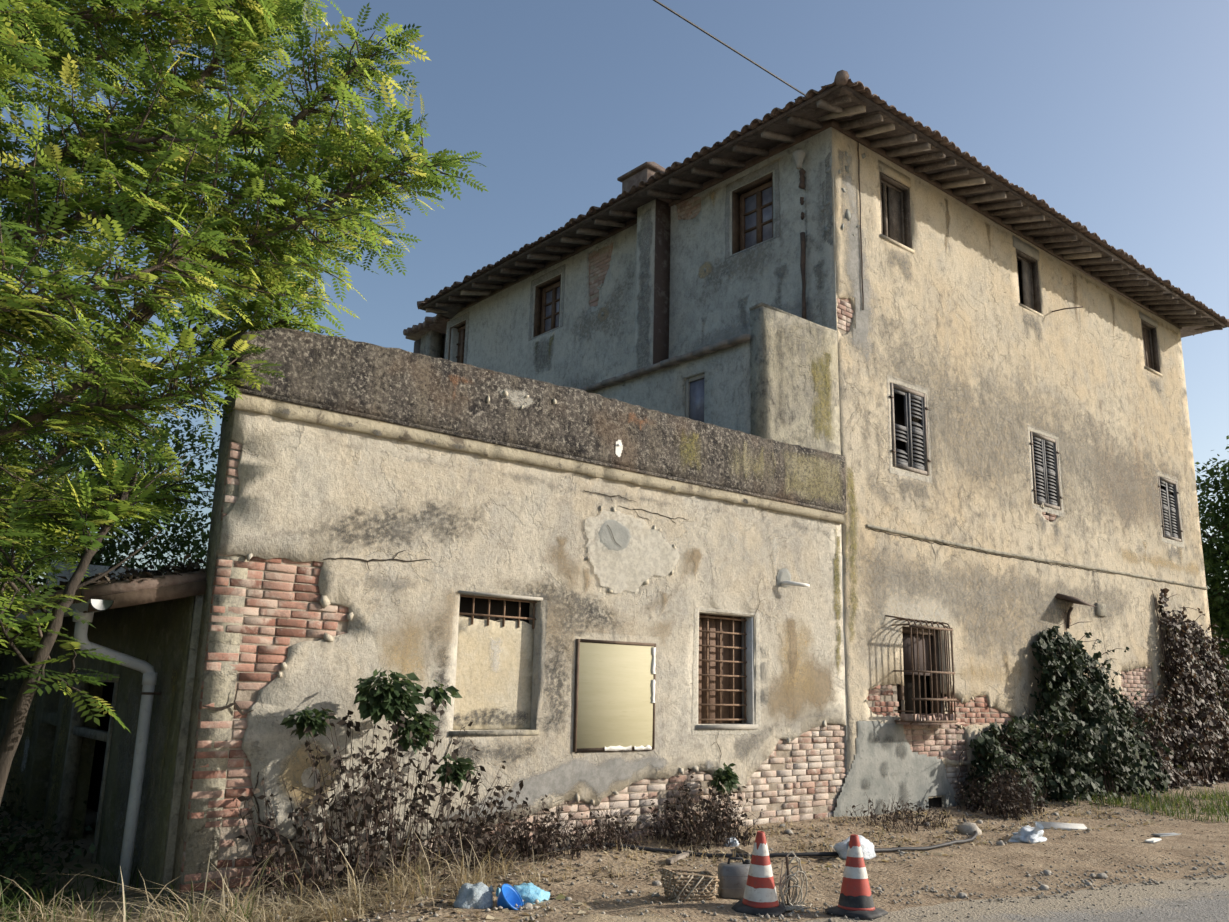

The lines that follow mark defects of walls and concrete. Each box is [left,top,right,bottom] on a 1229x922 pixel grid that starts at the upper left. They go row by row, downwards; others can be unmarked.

spalling [588,242,614,307]
spalling [836,298,854,335]
crack [584,490,689,547]
crack [323,550,432,571]
spalling [177,550,354,908]
spalling [394,720,846,861]